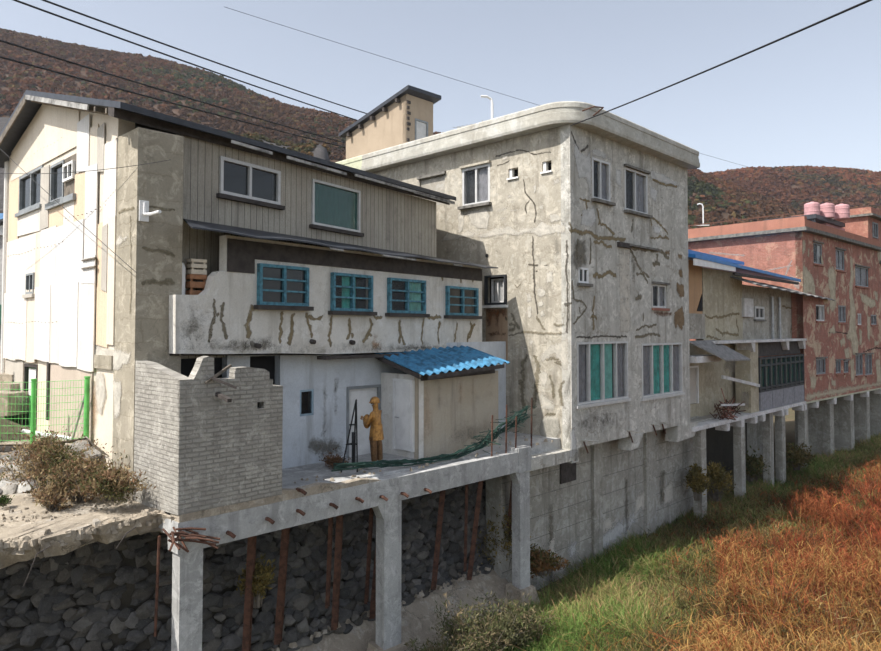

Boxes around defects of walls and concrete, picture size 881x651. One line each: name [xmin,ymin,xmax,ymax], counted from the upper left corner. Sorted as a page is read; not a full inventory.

crack [496,149,551,166]
crack [653,179,677,188]
crack [505,179,669,339]
spalling [665,251,685,329]
peeling [765,241,815,298]
peeling [806,254,881,402]
crack [519,355,564,416]